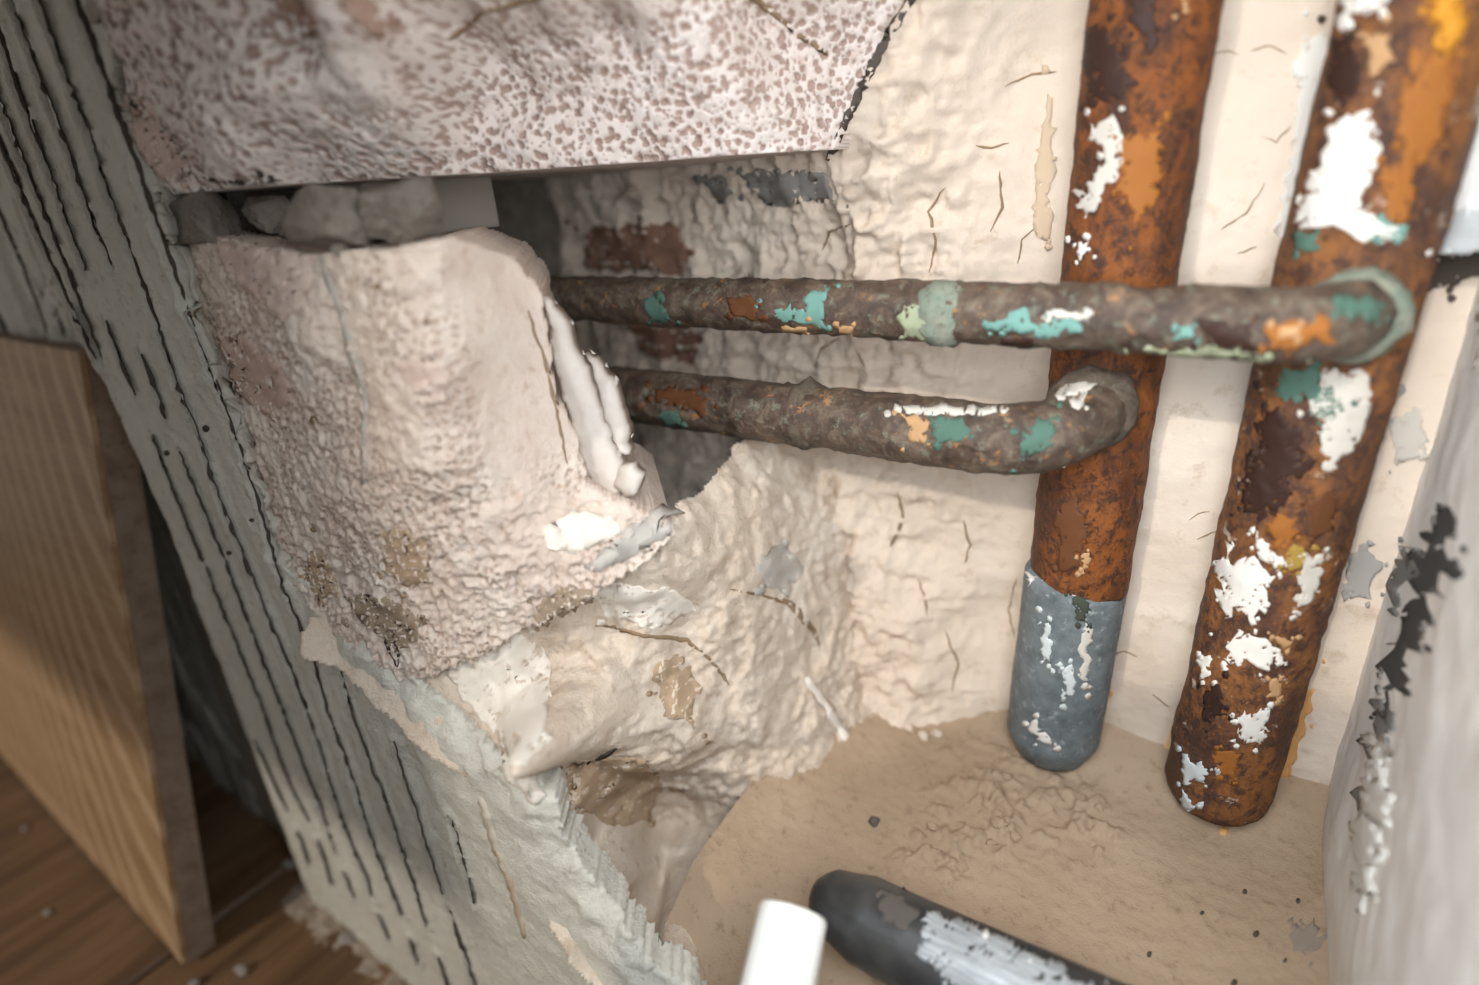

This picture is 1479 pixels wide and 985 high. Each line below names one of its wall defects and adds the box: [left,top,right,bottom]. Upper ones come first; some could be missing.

crack [447,0,539,40]
crack [750,0,828,56]
spalling [545,0,1089,284]
corrosion [1078,0,1161,112]
corrosion [1107,110,1172,251]
spalling [1178,0,1337,286]
corrosion [1374,0,1474,240]
spalling [544,295,1051,508]
corrosion [1191,314,1337,362]
crack [595,624,729,685]
crack [730,589,820,646]
spalling [664,251,1479,985]